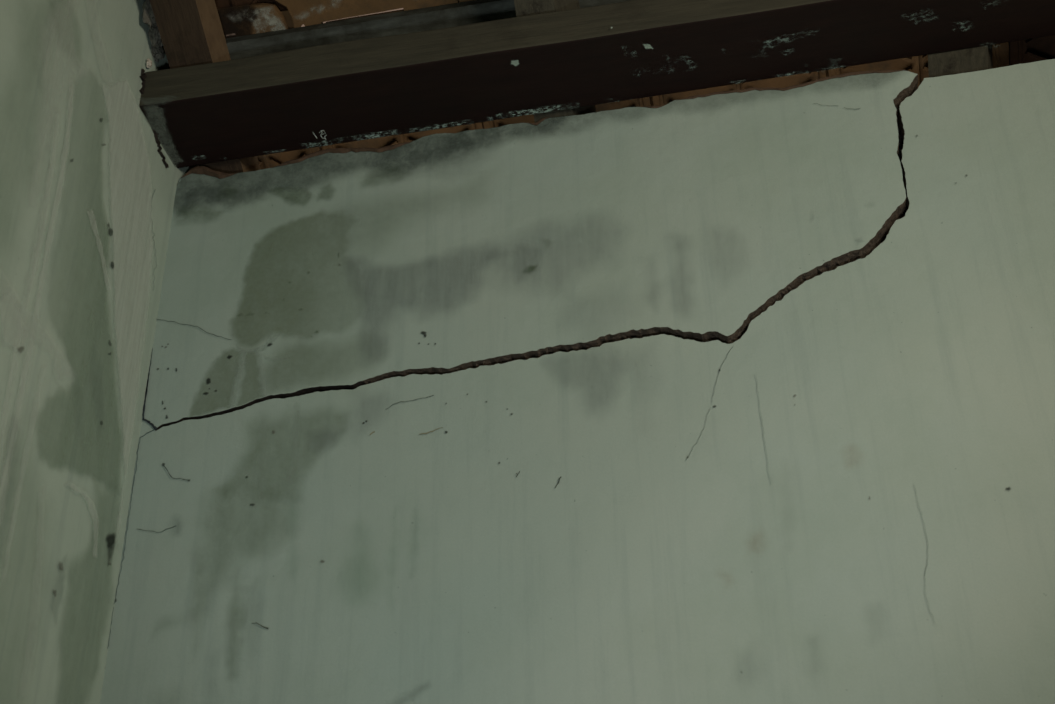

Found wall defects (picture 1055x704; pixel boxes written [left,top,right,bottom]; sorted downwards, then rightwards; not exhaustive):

crack [107,74,924,649]